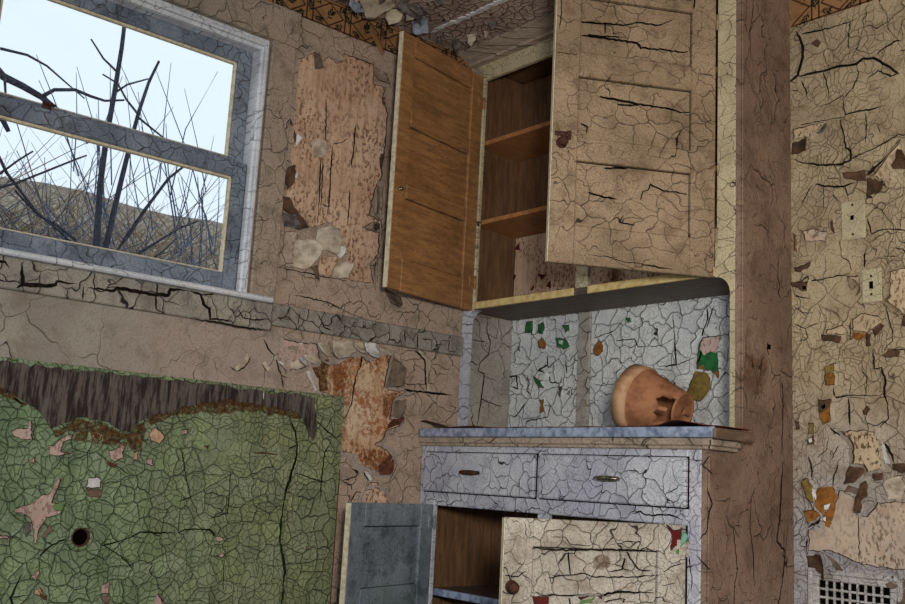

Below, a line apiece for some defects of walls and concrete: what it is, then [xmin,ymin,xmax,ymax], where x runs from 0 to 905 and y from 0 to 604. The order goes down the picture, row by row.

peeling [349,0,509,35]
peeling [280,47,403,307]
crack [790,14,905,207]
peeling [0,473,66,546]
crack [99,447,231,589]
crack [0,260,364,386]
crack [254,416,398,604]
peeling [273,336,407,503]
crack [388,311,567,427]
crack [777,216,905,342]
peeling [793,362,905,604]
peeling [821,266,905,346]